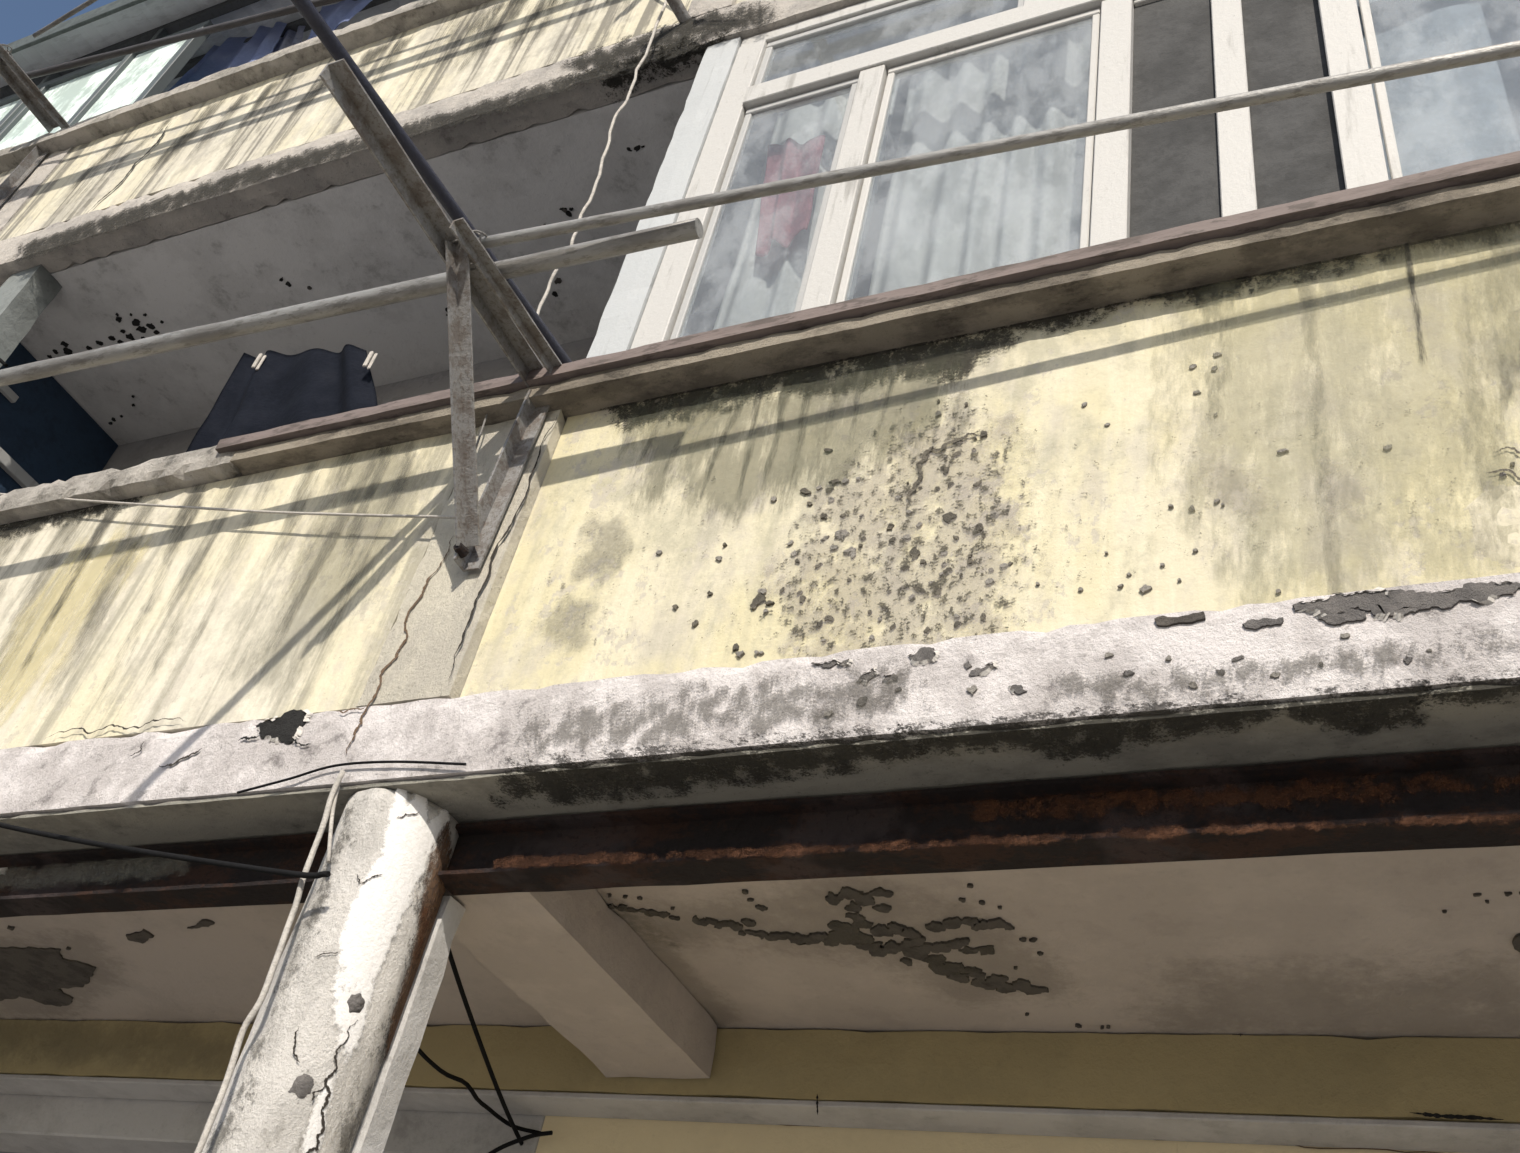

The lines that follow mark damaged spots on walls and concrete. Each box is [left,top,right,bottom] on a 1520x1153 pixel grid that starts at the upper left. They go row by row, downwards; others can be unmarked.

damp [401,0,777,139]
damp [545,223,1517,658]
crack [337,538,452,753]
crack [448,417,557,680]
peeling [1242,581,1520,639]
spalling [238,709,314,746]
damp [490,668,1520,809]
corrosion [494,820,1333,868]
corrosion [1385,813,1520,826]
corrosion [386,821,452,1056]
peeling [608,883,1049,1016]
crack [293,1020,358,1153]